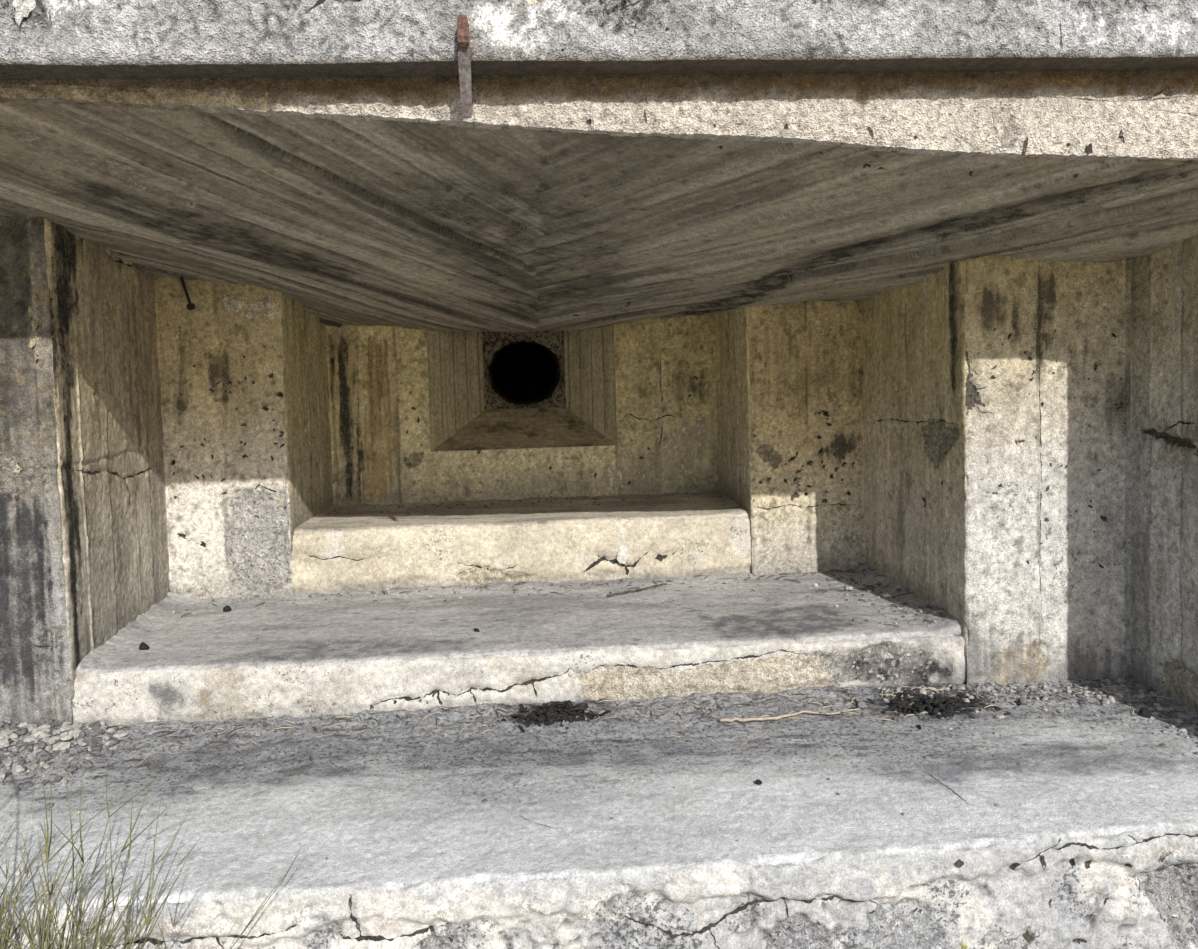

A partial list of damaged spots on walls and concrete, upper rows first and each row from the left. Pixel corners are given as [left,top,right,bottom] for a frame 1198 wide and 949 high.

damp [0,221,83,699]
crack [1141,421,1198,456]
crack [584,551,676,576]
crack [374,649,818,705]
spalling [1161,659,1198,714]
crack [1028,833,1198,861]
crack [98,895,449,949]